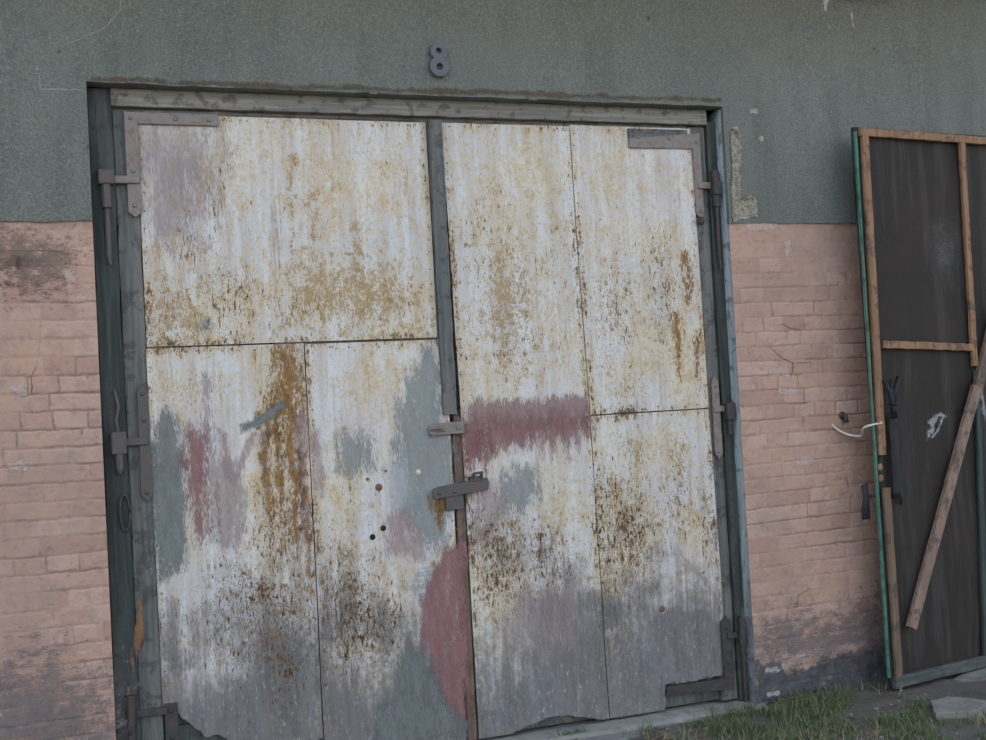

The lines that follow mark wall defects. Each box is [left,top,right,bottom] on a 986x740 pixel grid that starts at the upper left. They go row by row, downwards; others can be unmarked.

flaking render [730,126,779,232]
rust [141,250,256,341]
rust [262,154,431,351]
rust [469,239,536,347]
rust [680,250,694,304]
rust [668,313,710,402]
rust [190,341,427,719]
rust [427,496,549,610]
rust [582,437,657,605]
water stain [0,647,127,740]
water stain [742,579,887,705]